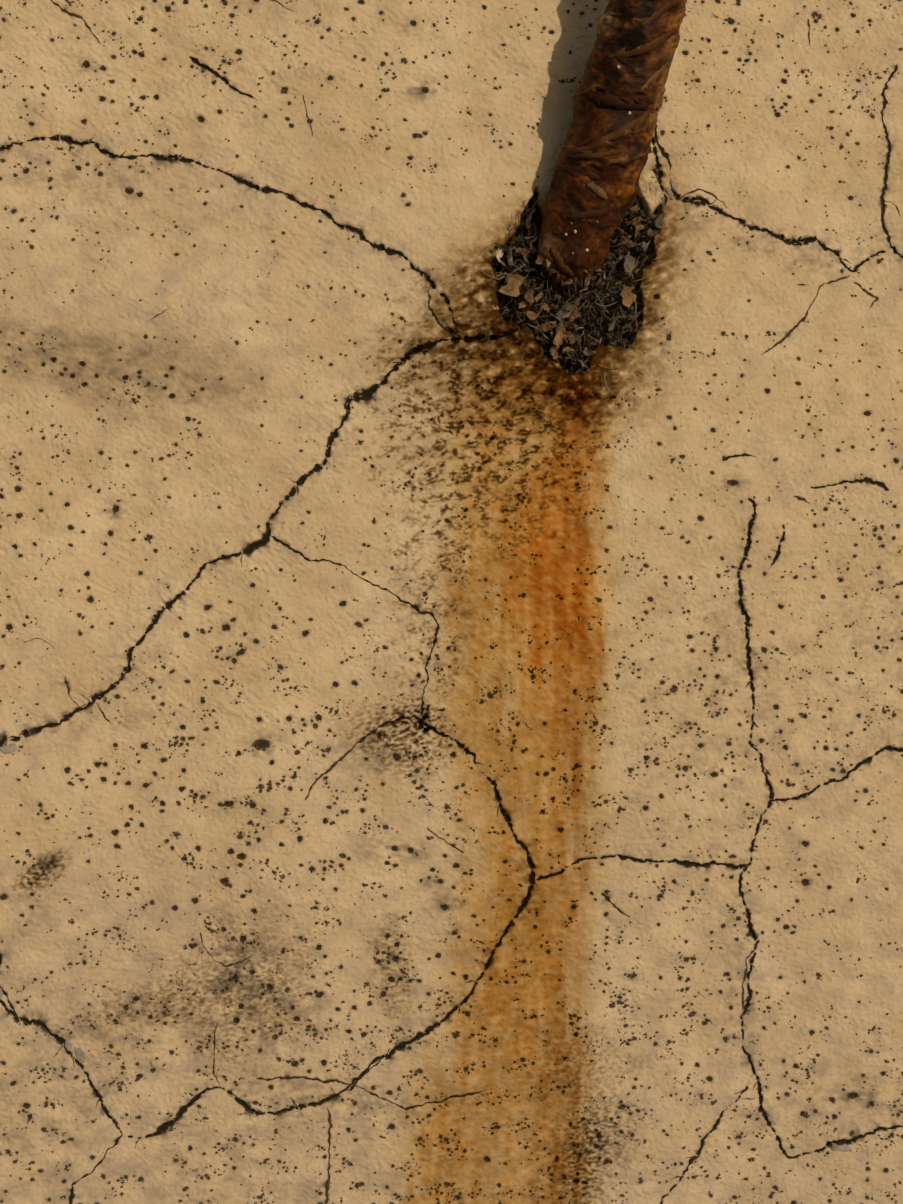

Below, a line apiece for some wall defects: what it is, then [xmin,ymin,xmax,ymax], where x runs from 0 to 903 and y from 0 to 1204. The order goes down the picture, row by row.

crack [51,0,101,44]
crack [189,56,258,101]
crack [0,135,456,330]
spalling [480,166,668,404]
crack [651,65,903,355]
crack [0,334,903,1204]